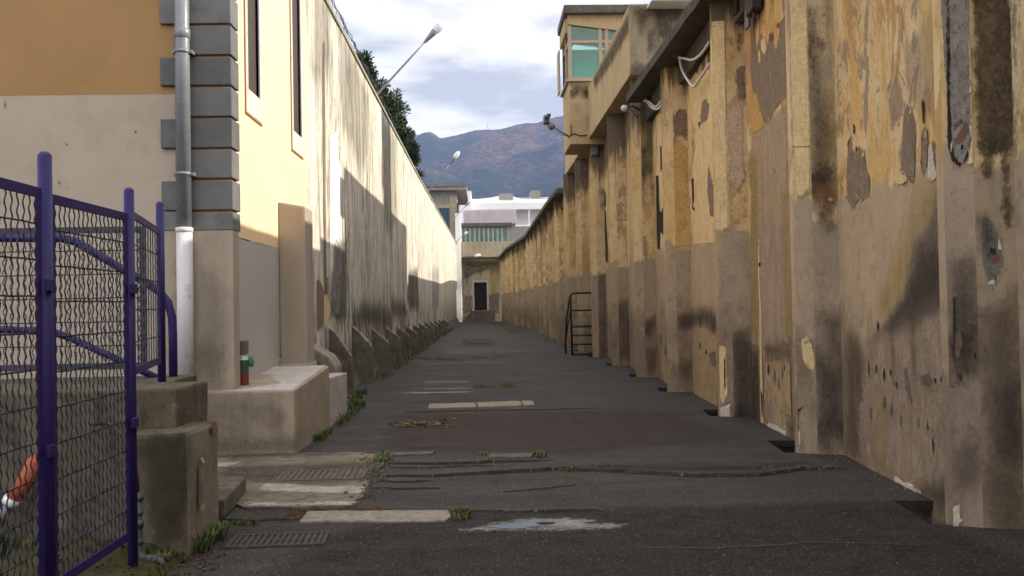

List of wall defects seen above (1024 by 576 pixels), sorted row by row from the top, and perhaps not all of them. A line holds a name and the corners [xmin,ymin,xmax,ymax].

flaking render [657,0,815,453]
peeling [846,124,870,209]
peeling [896,99,936,185]
peeling [941,0,973,165]
water stain [972,0,1013,227]
flaking render [982,216,1003,284]